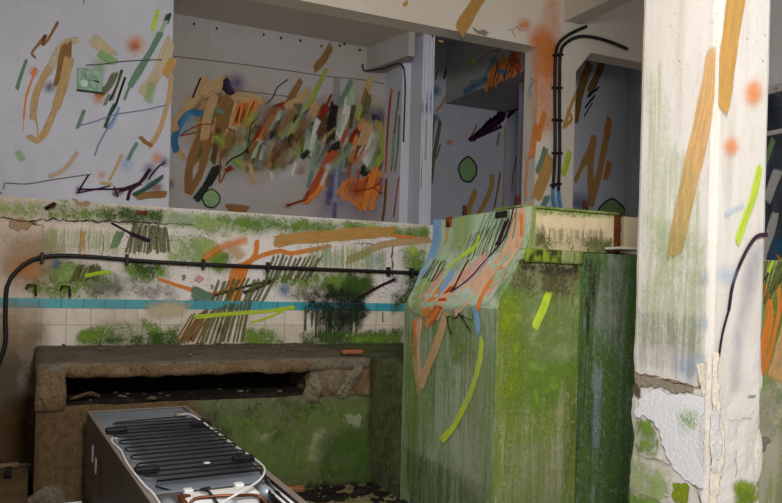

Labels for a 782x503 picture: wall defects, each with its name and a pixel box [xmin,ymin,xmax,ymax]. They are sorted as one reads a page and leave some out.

crack [0,216,194,256]
damp [86,278,179,300]
damp [508,259,580,299]
spalling [290,364,371,403]
peeling [633,351,726,503]